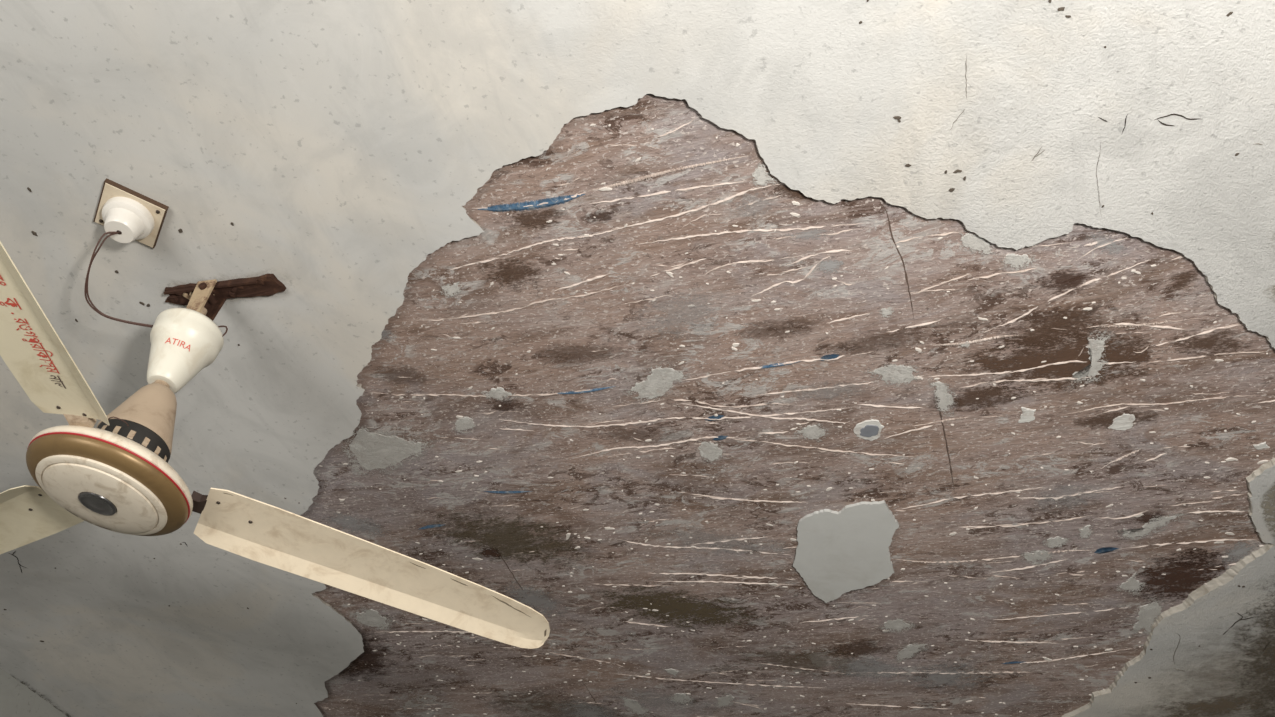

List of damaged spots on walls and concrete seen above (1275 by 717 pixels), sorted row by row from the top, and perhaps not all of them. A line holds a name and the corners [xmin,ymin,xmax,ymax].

spalling [300,94,1275,717]
water stain [1261,486,1275,537]
water stain [1162,595,1275,717]